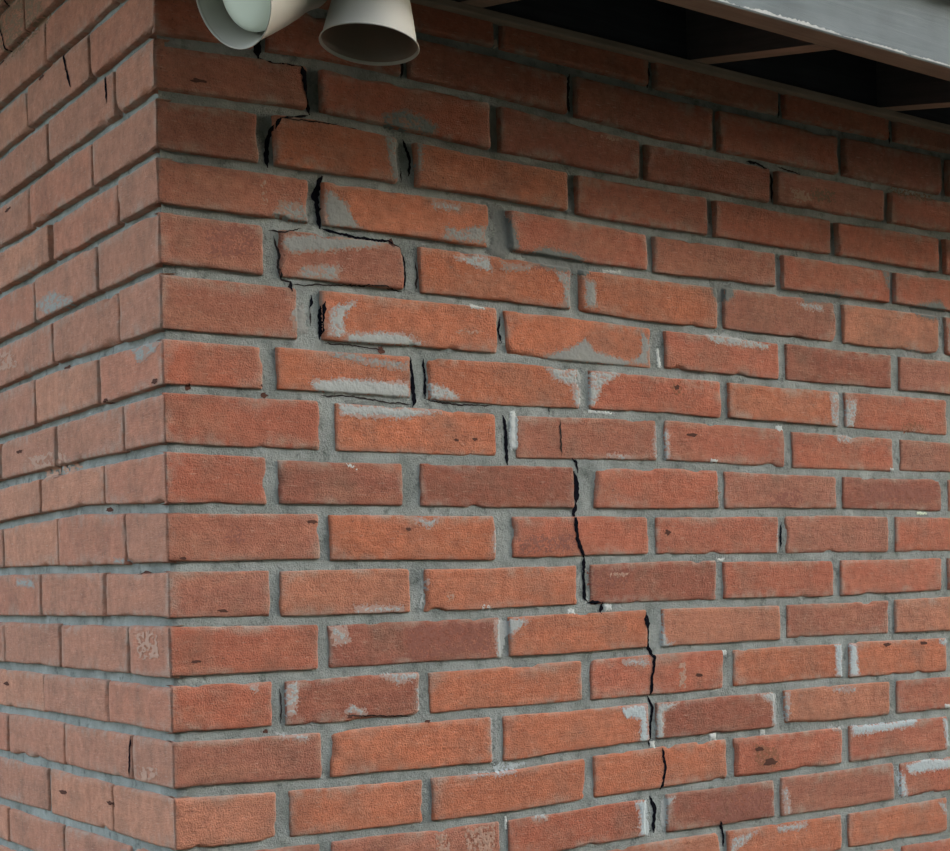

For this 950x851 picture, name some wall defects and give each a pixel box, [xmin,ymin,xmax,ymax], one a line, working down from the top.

crack [253,40,362,168]
crack [564,74,572,112]
crack [400,140,411,181]
crack [746,161,800,202]
crack [268,175,418,351]
crack [321,357,509,465]
crack [548,408,603,614]
crack [276,689,284,723]
crack [349,712,410,720]
crack [644,612,667,833]